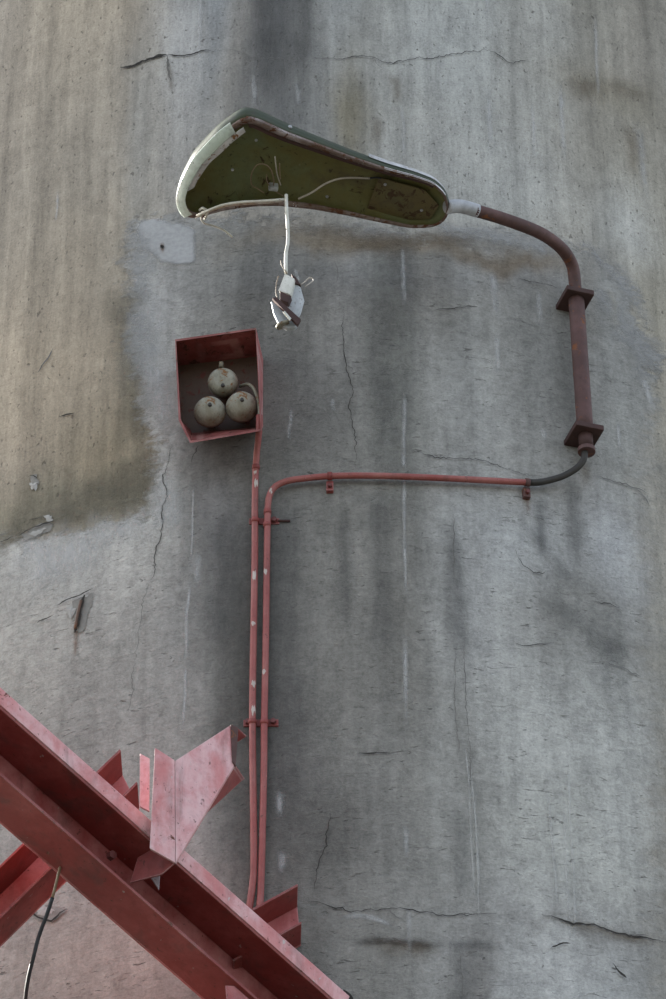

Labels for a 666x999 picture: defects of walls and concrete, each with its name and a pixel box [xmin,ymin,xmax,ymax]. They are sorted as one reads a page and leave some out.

crack [120,49,524,81]
crack [337,307,357,467]
spalling [58,588,93,647]
crack [128,447,197,711]
crack [313,816,494,918]